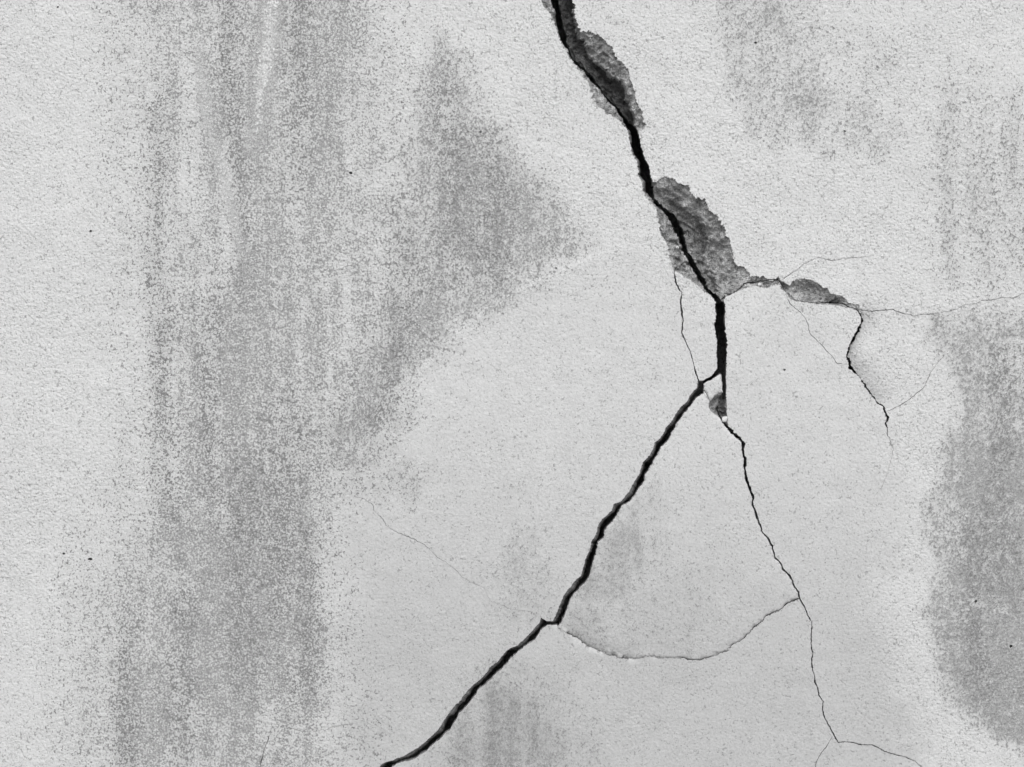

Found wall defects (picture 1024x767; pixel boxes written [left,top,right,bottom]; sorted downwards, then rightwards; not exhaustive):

leakage [44,0,597,767]
spalling [541,0,647,132]
crack [357,3,1021,767]
spalling [642,176,862,315]
leakage [916,65,1024,752]